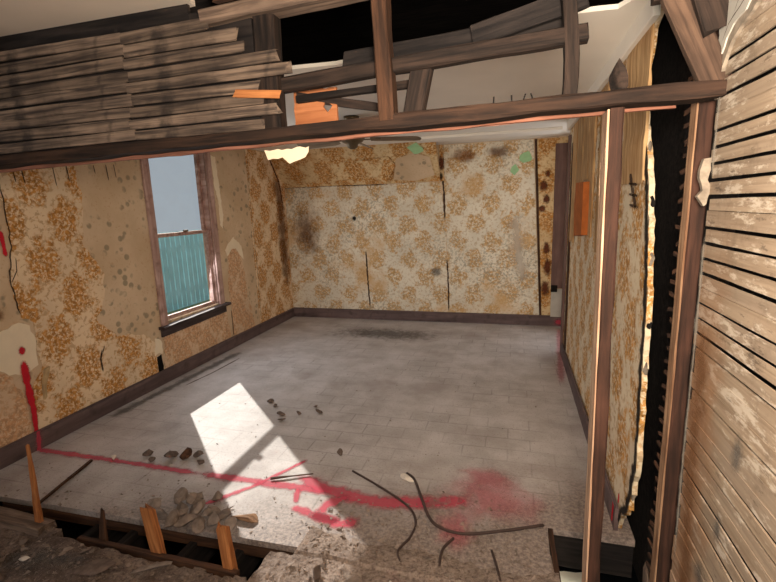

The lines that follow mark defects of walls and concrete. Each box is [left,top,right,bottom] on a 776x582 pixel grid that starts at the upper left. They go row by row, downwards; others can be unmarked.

rust [539,171,550,212]
rust [541,243,551,295]
spalling [0,323,38,376]
spalling [155,339,164,372]
spalling [618,141,655,524]